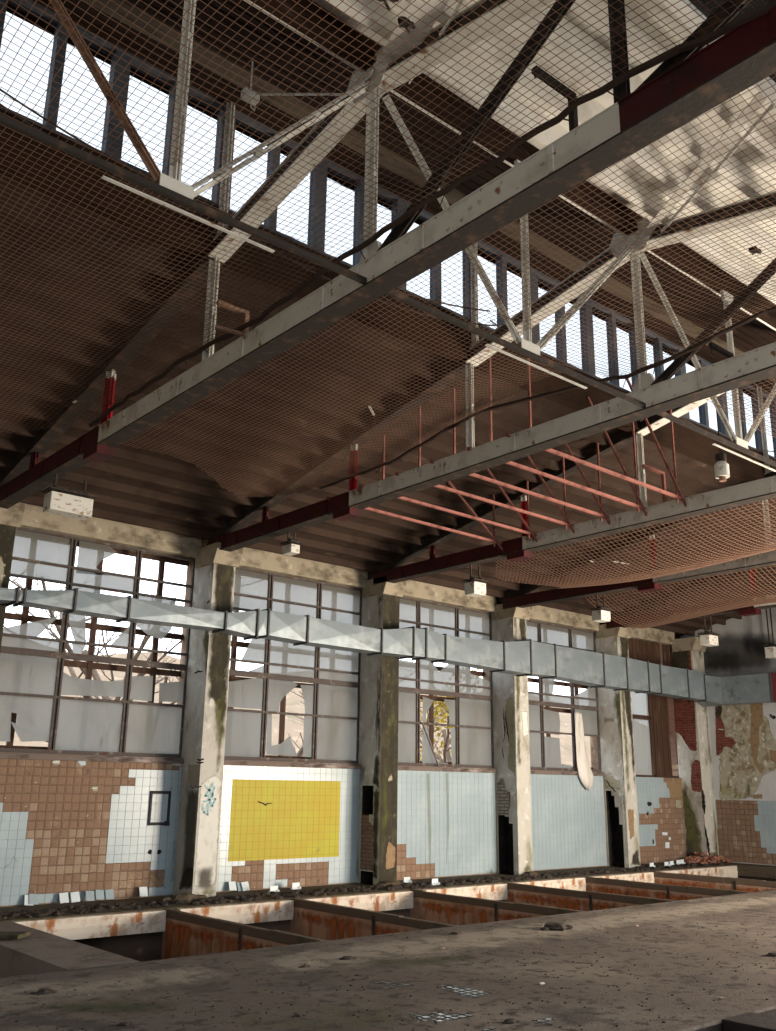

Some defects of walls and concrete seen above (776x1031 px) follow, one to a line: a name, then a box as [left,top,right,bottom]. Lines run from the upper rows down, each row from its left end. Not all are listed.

damp [0,524,16,588]
damp [212,563,234,613]
flaking render [660,644,692,670]
damp [203,631,230,760]
peeling [0,759,182,898]
flaking render [604,766,625,844]
flaking render [639,697,776,868]
peeling [231,860,329,892]
peeling [397,844,440,885]
corrosion [479,870,768,923]
corrosion [165,922,272,959]